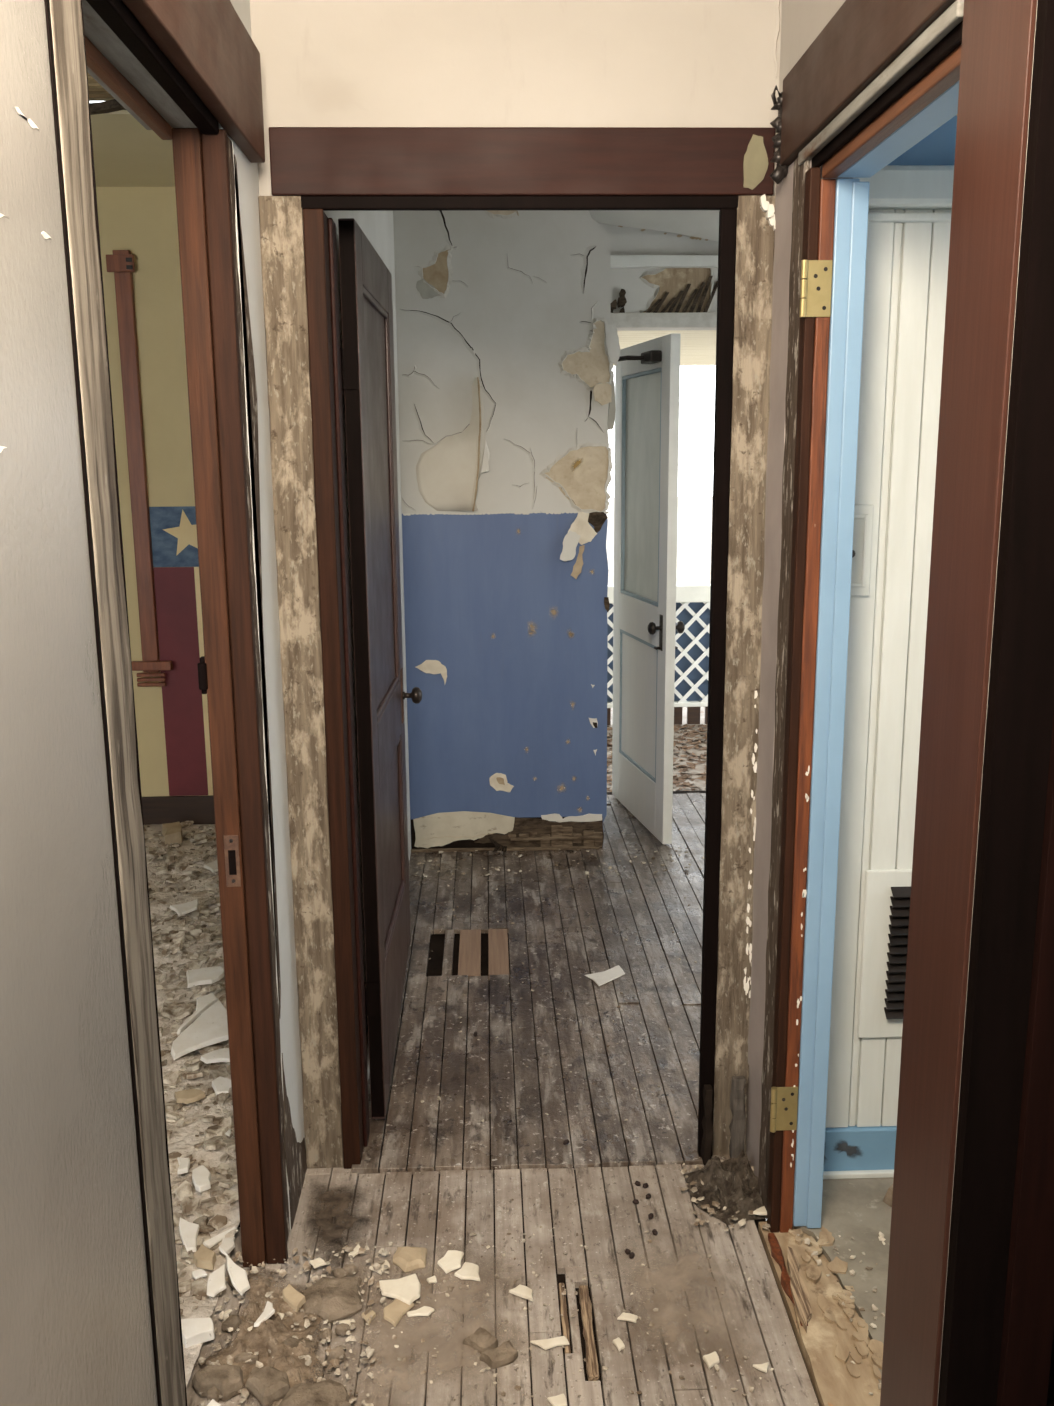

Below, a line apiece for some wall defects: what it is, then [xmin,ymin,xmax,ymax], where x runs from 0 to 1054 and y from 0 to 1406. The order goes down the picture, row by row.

flaking render [484,210,519,219]
crack [506,245,598,325]
crack [400,211,538,511]
flaking render [403,245,718,579]
crack [575,390,604,446]
peeling [416,660,447,683]
peeling [489,773,514,792]
flaking render [411,811,604,853]